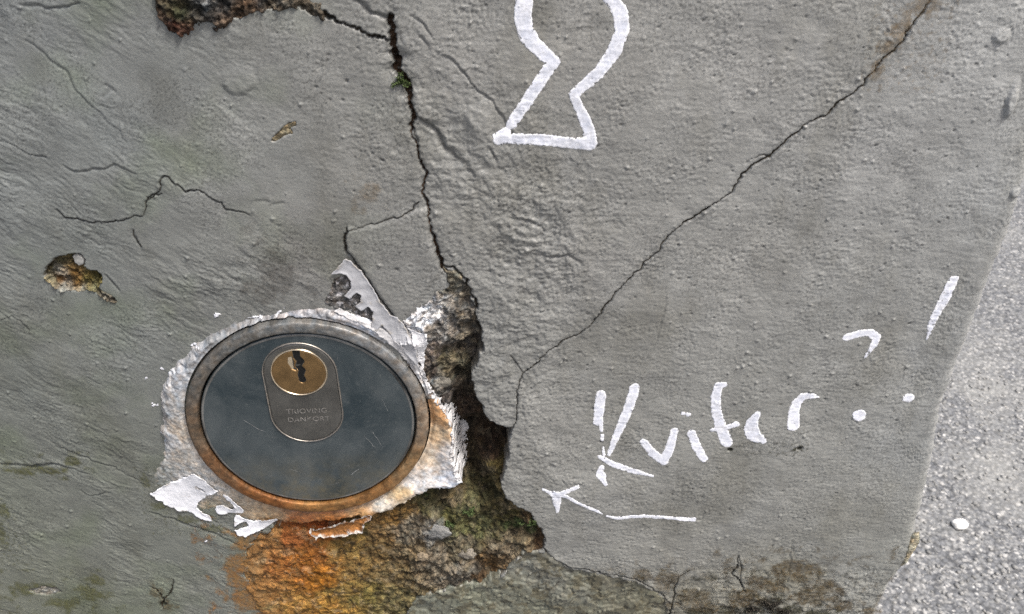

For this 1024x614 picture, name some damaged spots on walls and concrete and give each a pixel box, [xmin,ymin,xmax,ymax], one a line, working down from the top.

spalling [155,0,327,38]
crack [326,11,478,312]
crack [60,175,245,246]
crack [511,0,930,427]
spalling [44,253,117,304]
spalling [150,259,669,614]
corrosion [213,530,282,614]